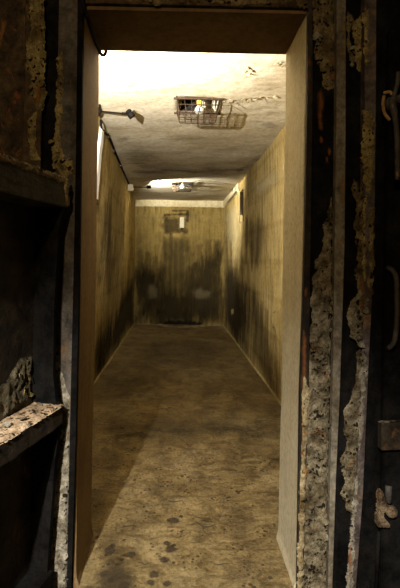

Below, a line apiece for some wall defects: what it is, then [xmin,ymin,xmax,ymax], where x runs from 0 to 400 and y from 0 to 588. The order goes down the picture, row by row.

peeling [0,0,73,207]
peeling [346,9,370,72]
peeling [0,346,70,588]
damp [94,250,250,375]
peeling [296,197,334,588]
peeling [340,110,375,588]